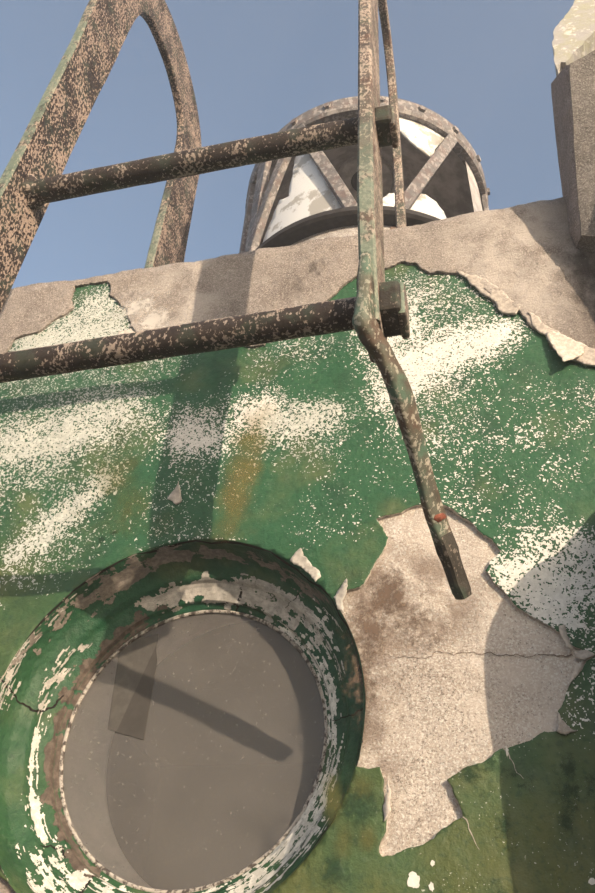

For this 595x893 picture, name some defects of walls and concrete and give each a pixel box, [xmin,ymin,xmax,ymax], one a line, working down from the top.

damp [124,293,172,329]
peeling [0,197,595,893]
crack [25,540,572,659]
crack [1,658,64,712]
crack [298,708,363,866]